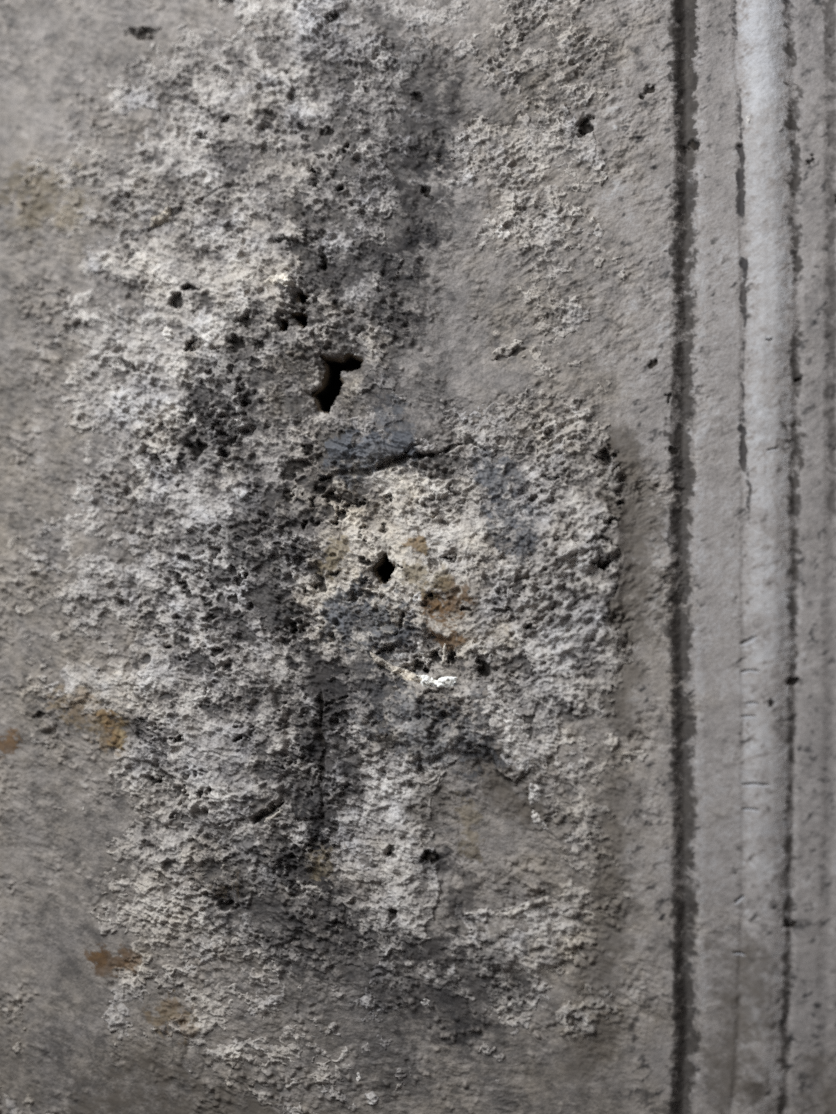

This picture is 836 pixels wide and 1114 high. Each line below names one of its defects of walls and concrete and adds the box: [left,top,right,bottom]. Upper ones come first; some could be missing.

leakage [666,0,699,88]
spalling [578,119,594,135]
leakage [784,83,802,130]
peeling [150,206,172,227]
leakage [312,145,456,299]
peeling [162,326,174,342]
peeling [492,339,523,355]
leakage [739,257,748,327]
leakage [737,365,752,510]
corrosion [19,0,632,1114]
peeling [367,645,648,900]
leakage [776,894,792,1067]